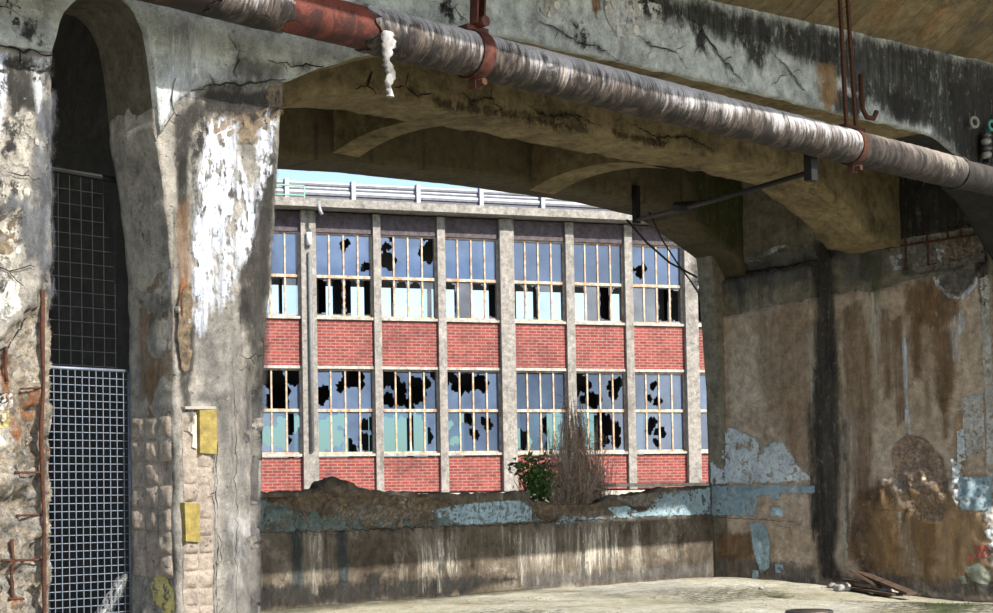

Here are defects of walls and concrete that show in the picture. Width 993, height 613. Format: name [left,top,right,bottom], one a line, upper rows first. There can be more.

water stain [7,0,45,46]
water stain [0,53,54,303]
water stain [140,27,280,423]
crack [165,32,325,126]
crack [357,72,432,97]
crack [770,53,807,95]
water stain [604,0,993,167]
rust [0,290,47,613]
spalling [0,111,53,613]
spalling [245,427,815,579]
water stain [260,241,993,613]
spalling [890,228,993,585]